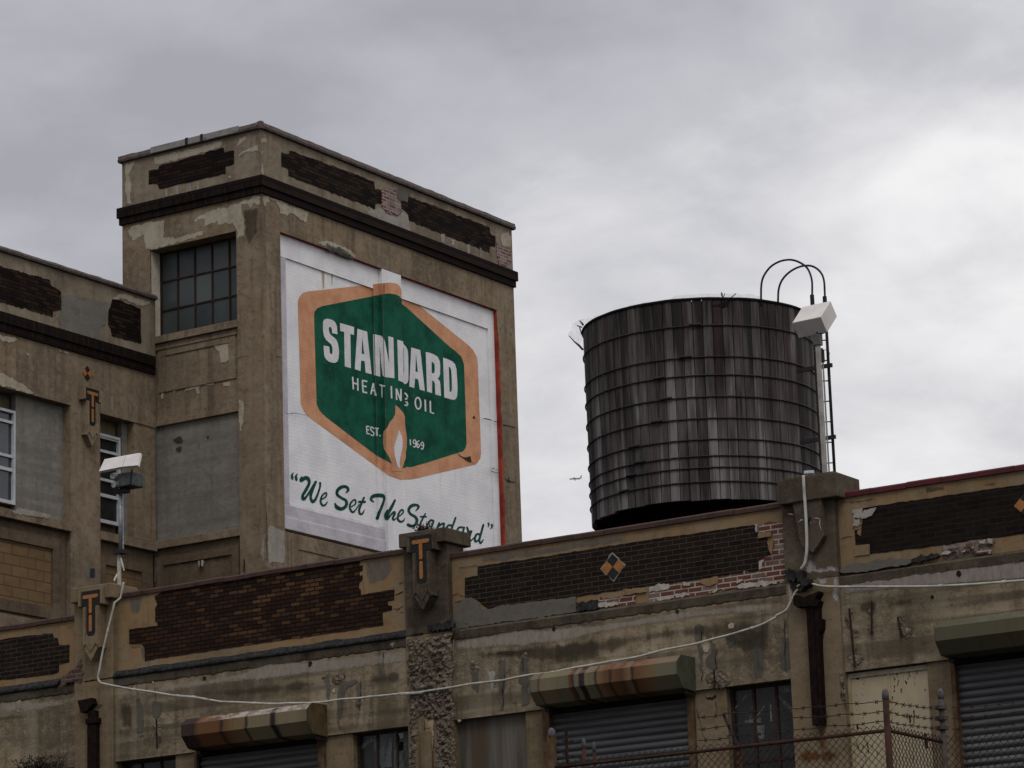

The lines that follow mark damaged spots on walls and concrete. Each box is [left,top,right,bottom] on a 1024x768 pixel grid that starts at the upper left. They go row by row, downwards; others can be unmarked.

flaking render [381,187,402,217]
flaking render [496,232,512,269]
flaking render [598,521,785,608]
flaking render [852,508,877,556]
flaking render [940,538,996,560]